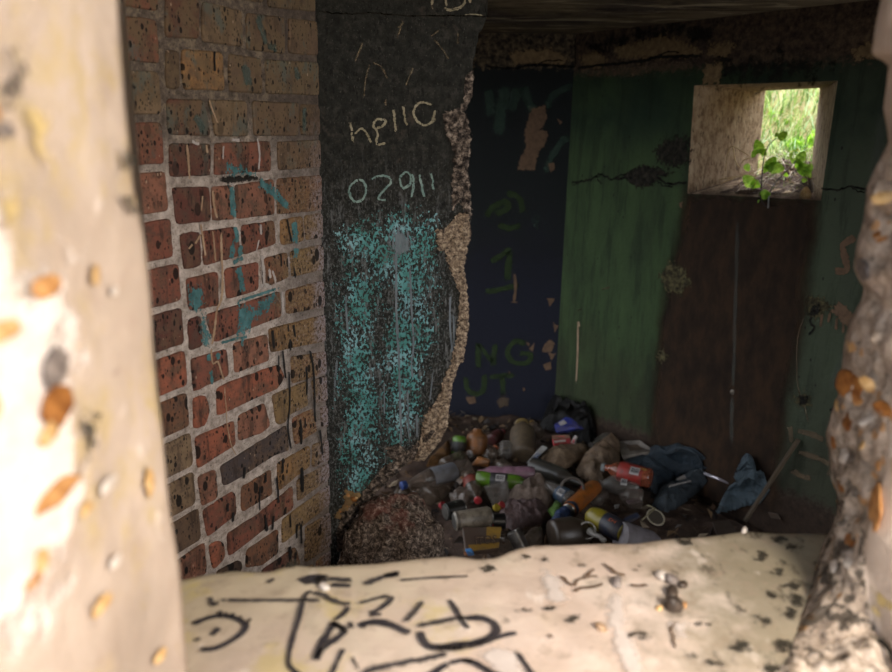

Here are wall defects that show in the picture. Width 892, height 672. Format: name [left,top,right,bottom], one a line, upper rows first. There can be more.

peeling [518,105,562,171]
crack [572,173,687,188]
crack [821,185,867,193]
peeling [329,70,474,552]
peeling [527,322,558,370]
crack [878,639,892,664]